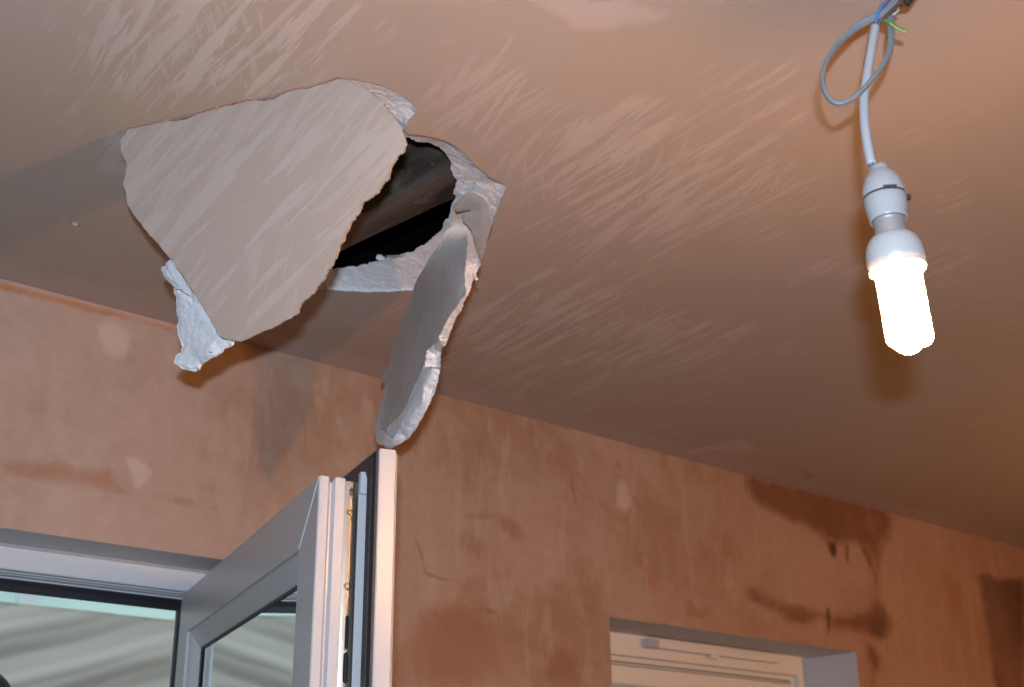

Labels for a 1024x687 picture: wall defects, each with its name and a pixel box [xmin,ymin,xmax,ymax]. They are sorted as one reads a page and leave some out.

damp [739,474,1024,687]